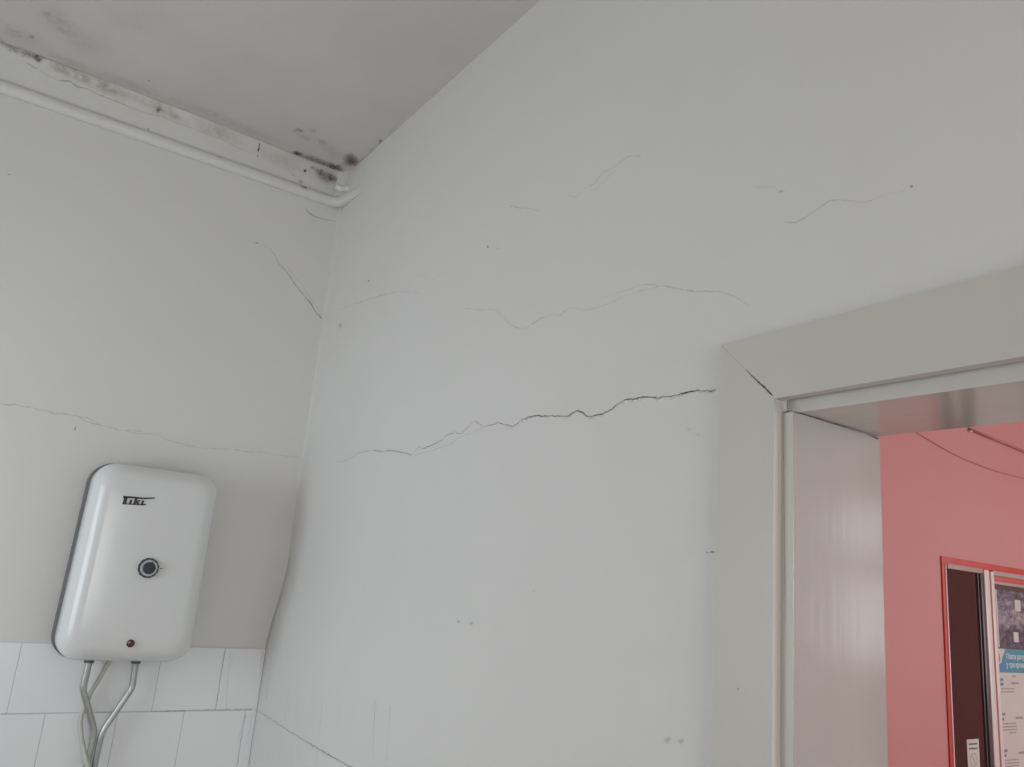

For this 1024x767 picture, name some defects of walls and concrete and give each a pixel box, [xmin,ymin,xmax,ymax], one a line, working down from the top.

crack [500,389,716,427]